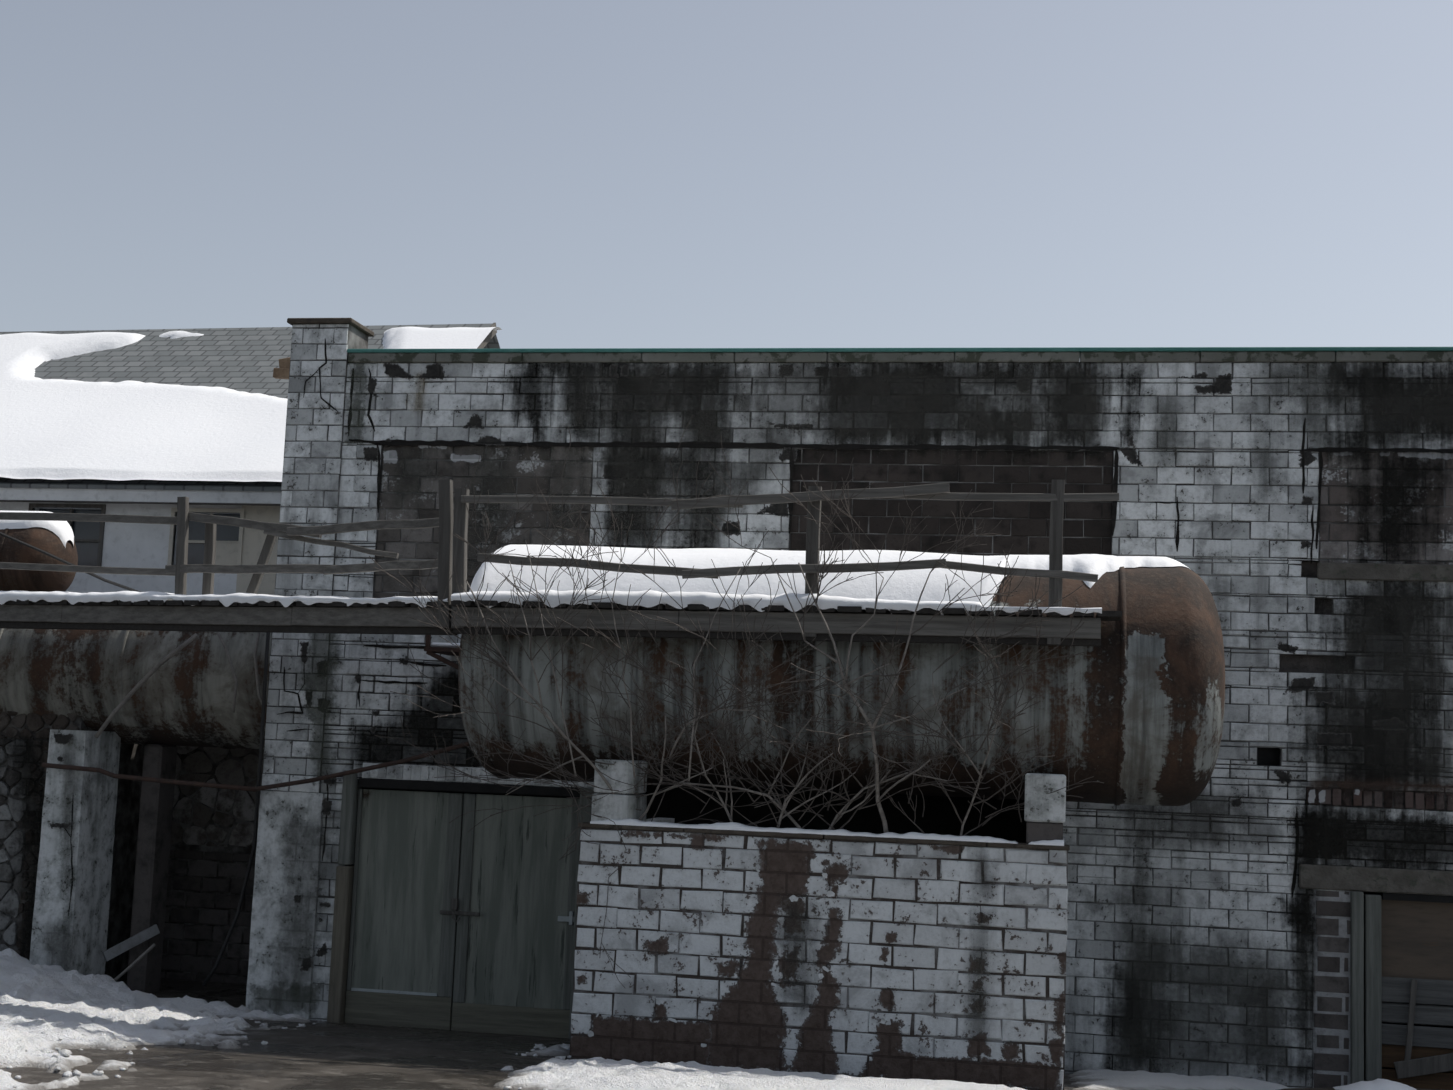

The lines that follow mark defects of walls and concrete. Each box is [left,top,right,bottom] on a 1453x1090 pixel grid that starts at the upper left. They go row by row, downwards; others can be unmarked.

crack [303,339,1119,536]
leakage [509,362,1141,549]
crack [1156,497,1180,552]
peeling [1380,452,1453,460]
leakage [351,667,481,783]
leakage [1105,362,1453,1078]